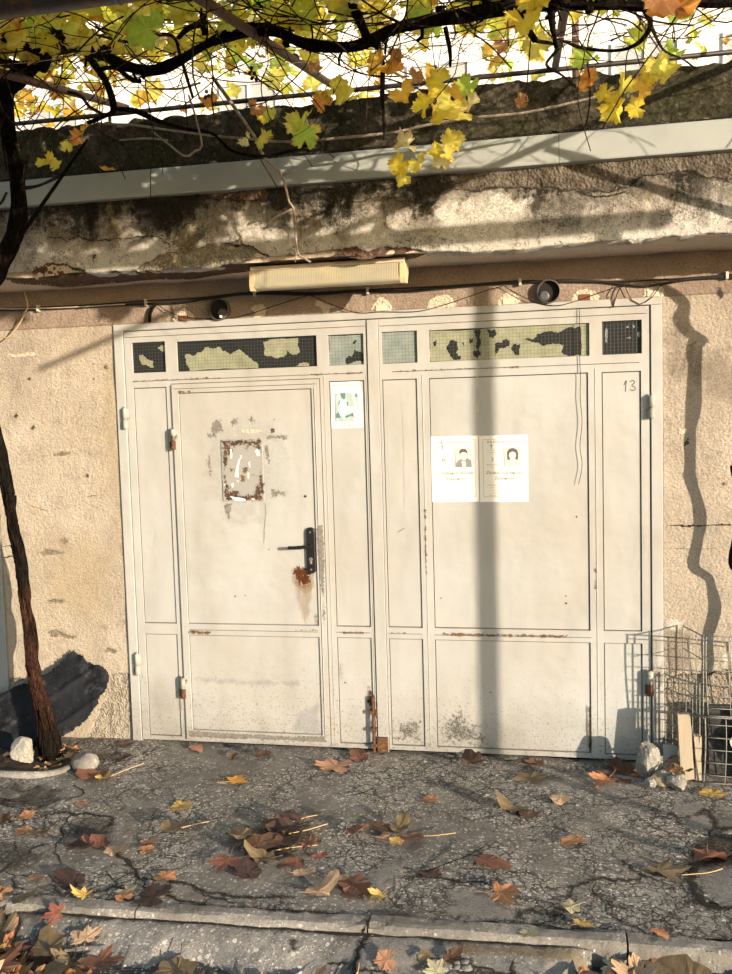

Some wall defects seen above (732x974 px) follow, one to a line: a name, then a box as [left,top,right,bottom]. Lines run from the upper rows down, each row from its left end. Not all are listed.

leakage [85,202,146,264]
leakage [134,195,203,238]
peeling [6,222,426,288]
leakage [222,214,262,238]
leakage [268,187,290,211]
crack [440,169,732,220]
peeling [185,338,309,371]
peeling [382,331,418,364]
peeling [430,324,589,362]
rust [293,525,325,597]
spalling [663,669,732,775]
crack [16,911,593,974]